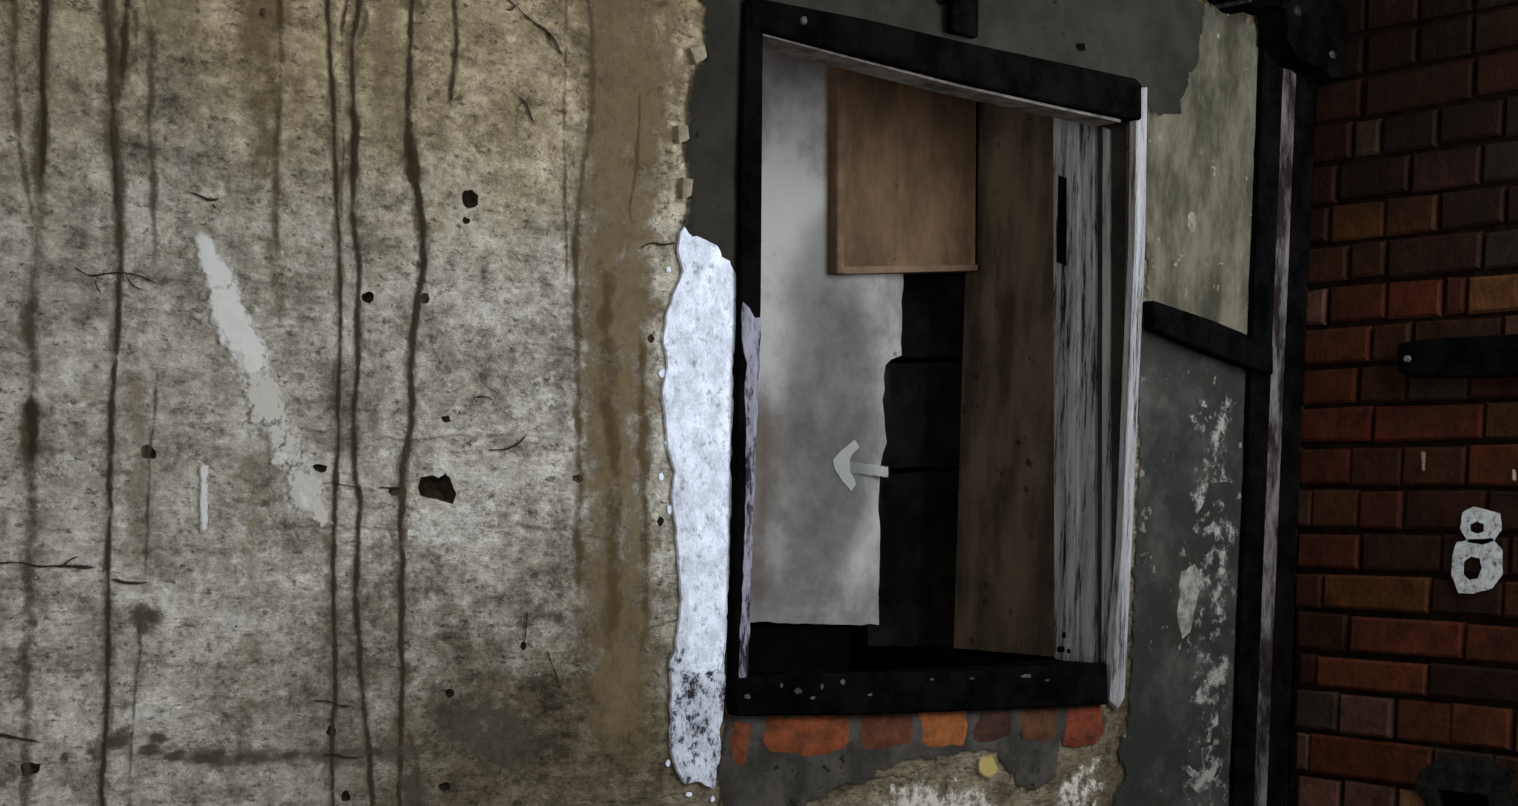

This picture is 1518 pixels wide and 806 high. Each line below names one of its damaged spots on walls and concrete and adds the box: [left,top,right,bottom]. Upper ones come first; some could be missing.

damp [11,0,50,212]
damp [18,276,68,805]
damp [88,0,539,806]
spalling [418,474,456,504]
peeling [647,0,1246,806]